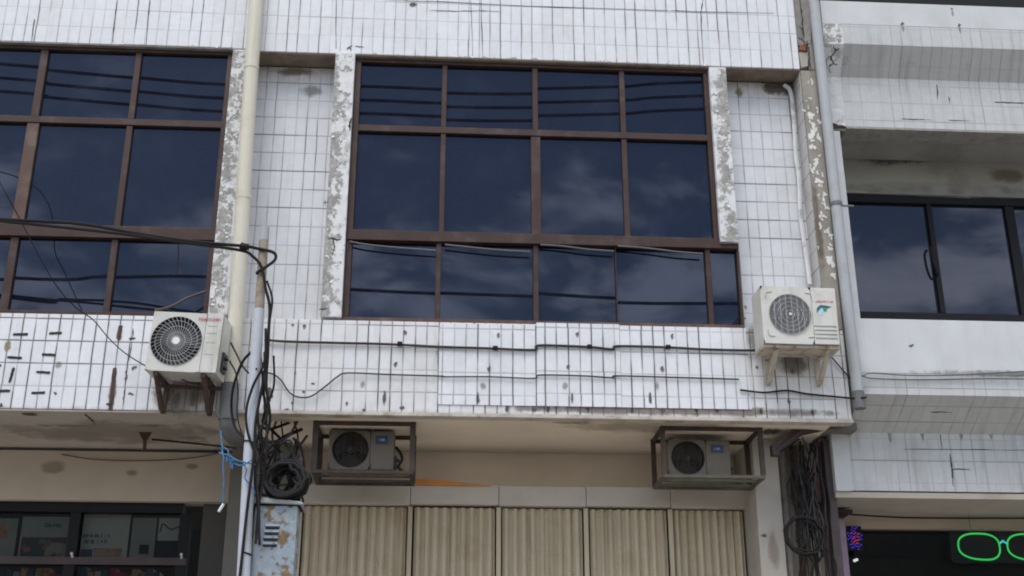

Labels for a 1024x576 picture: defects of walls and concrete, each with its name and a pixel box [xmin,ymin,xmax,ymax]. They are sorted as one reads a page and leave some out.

peeling [121,42,245,313]
peeling [320,53,738,316]
spalling [797,23,846,280]
crack [826,46,840,73]